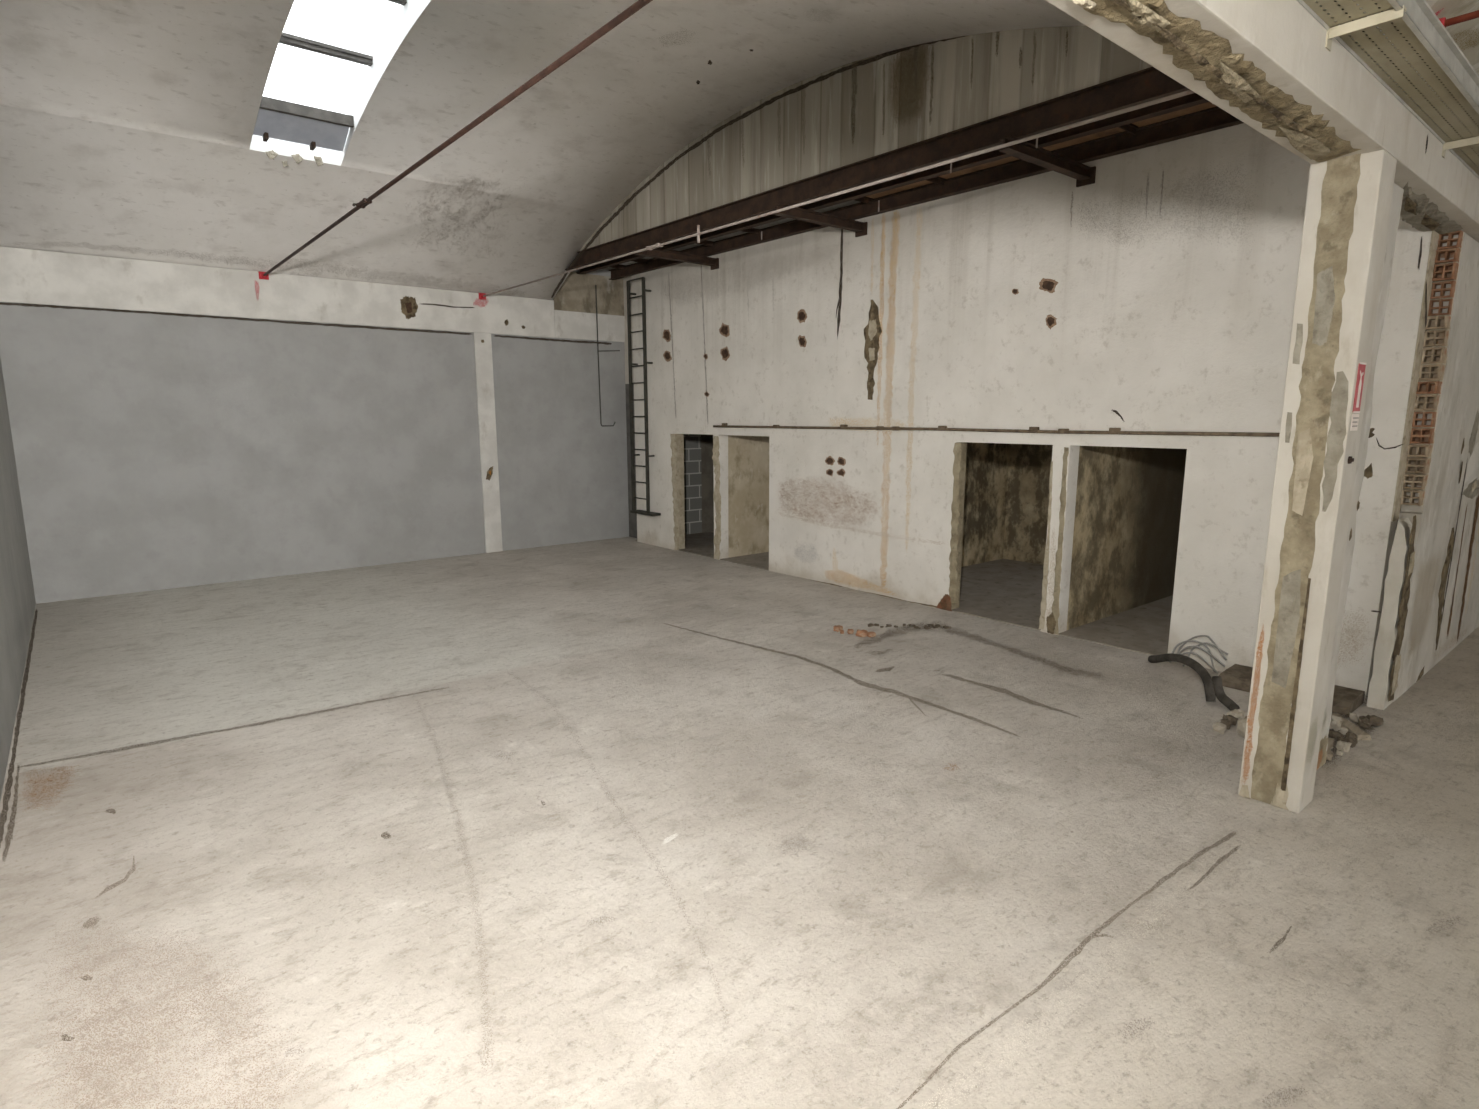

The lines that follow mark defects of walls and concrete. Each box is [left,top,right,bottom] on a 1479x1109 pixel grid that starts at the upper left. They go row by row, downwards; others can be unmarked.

flaking render [703,323,730,362]
flaking render [712,436,721,560]
flaking render [797,309,807,347]
flaking render [776,443,962,612]
flaking render [864,300,882,400]
flaking render [1039,278,1058,293]
flaking render [1039,447,1069,635]
spalling [1072,0,1361,811]
spalling [1388,182,1463,702]
crack [664,623,1084,737]
damp [17,895,326,1109]
crack [896,829,1241,1109]